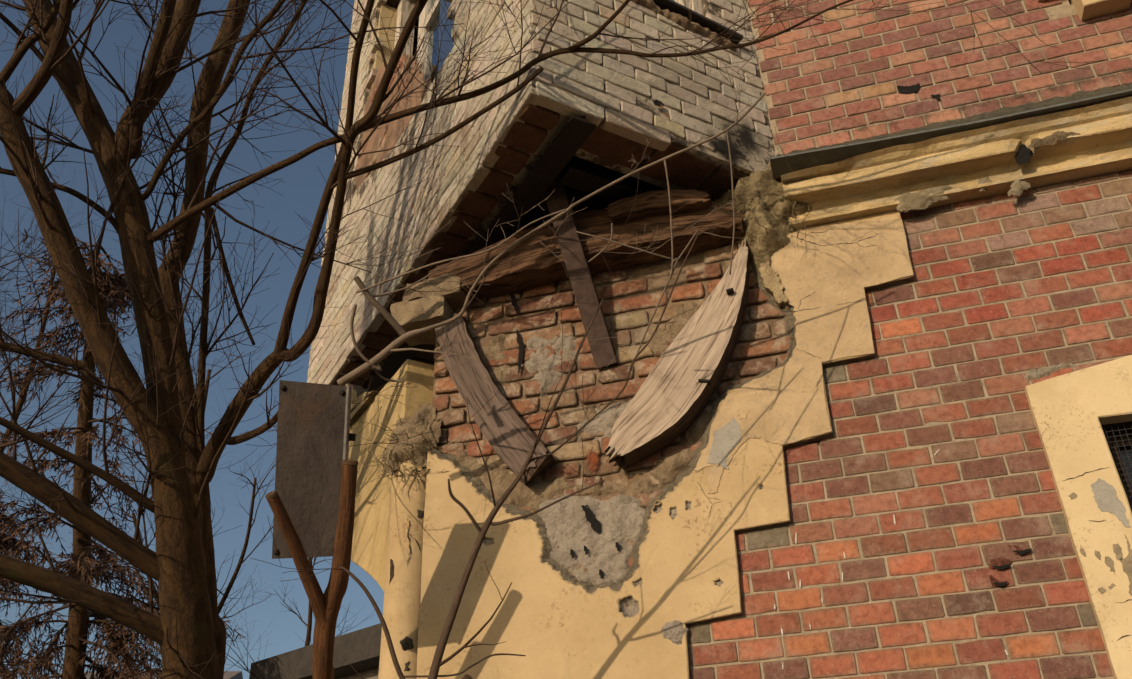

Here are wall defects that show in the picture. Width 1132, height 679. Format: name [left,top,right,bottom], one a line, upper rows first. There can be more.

spalling [897,83,940,100]
crack [793,234,877,247]
flaking render [429,186,953,617]
peeling [1080,478,1132,596]
spalling [988,545,1032,587]
spalling [661,620,688,645]